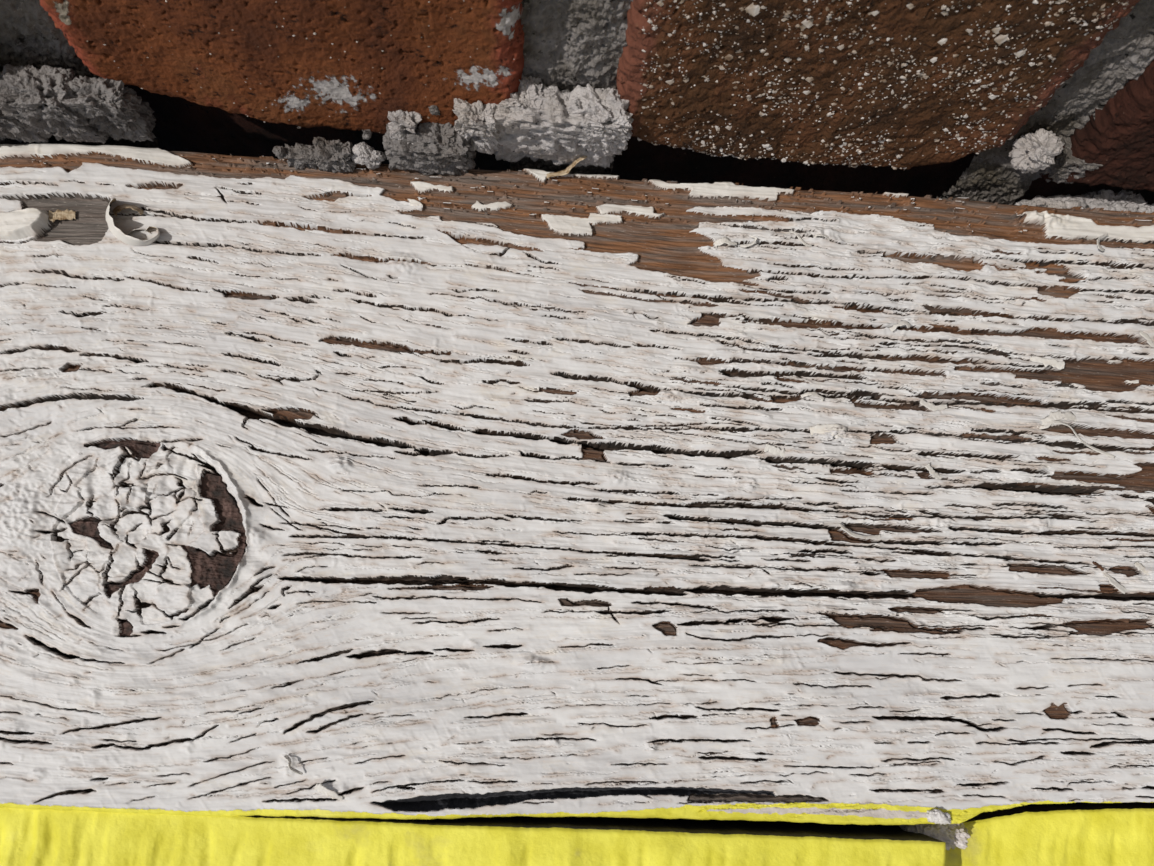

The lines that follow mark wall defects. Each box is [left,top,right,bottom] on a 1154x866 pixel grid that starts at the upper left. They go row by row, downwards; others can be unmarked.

crack [0,179,110,187]
peeling [0,144,1154,283]
peeling [1024,261,1087,299]
peeling [688,304,1154,392]
peeling [850,391,1044,412]
peeling [1042,422,1154,490]
crack [0,182,1154,804]
peeling [828,523,941,544]
peeling [1007,563,1090,576]
peeling [652,621,677,636]
peeling [817,568,1063,650]
peeling [1062,618,1154,636]